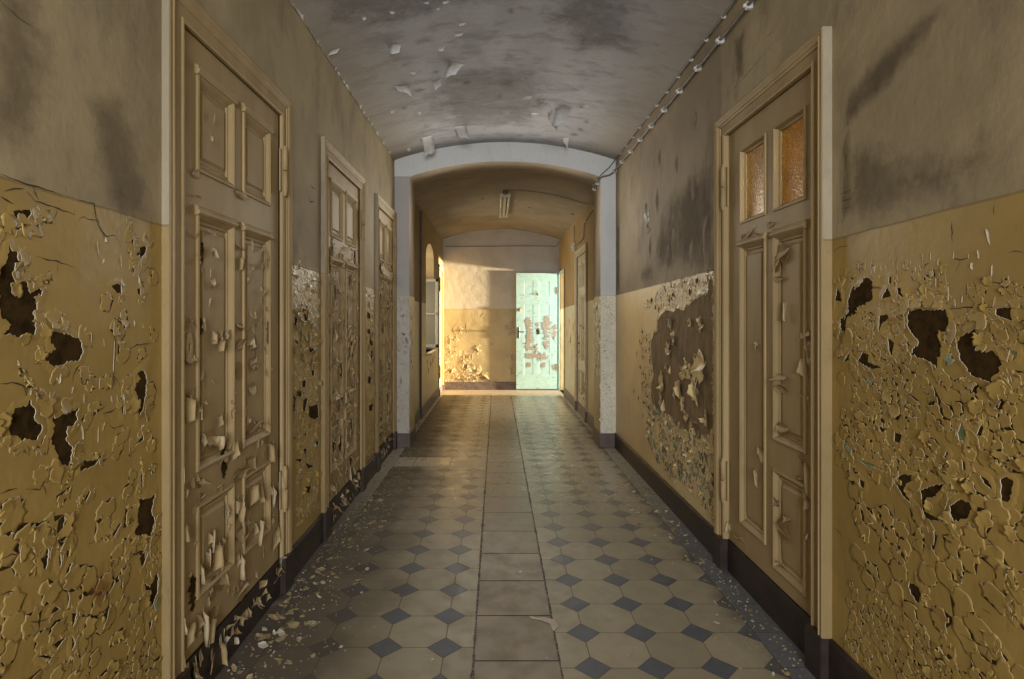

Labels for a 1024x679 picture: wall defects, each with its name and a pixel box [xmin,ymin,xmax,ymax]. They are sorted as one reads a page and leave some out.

peeling [432,62,465,90]
peeling [0,202,115,522]
crack [0,174,118,240]
peeling [107,216,154,308]
peeling [292,301,322,498]
peeling [428,327,498,382]
peeling [633,267,714,496]
peeling [832,253,1024,402]
peeling [11,530,76,584]
peeling [107,364,162,634]
peeling [193,556,300,679]
peeling [881,413,1020,552]